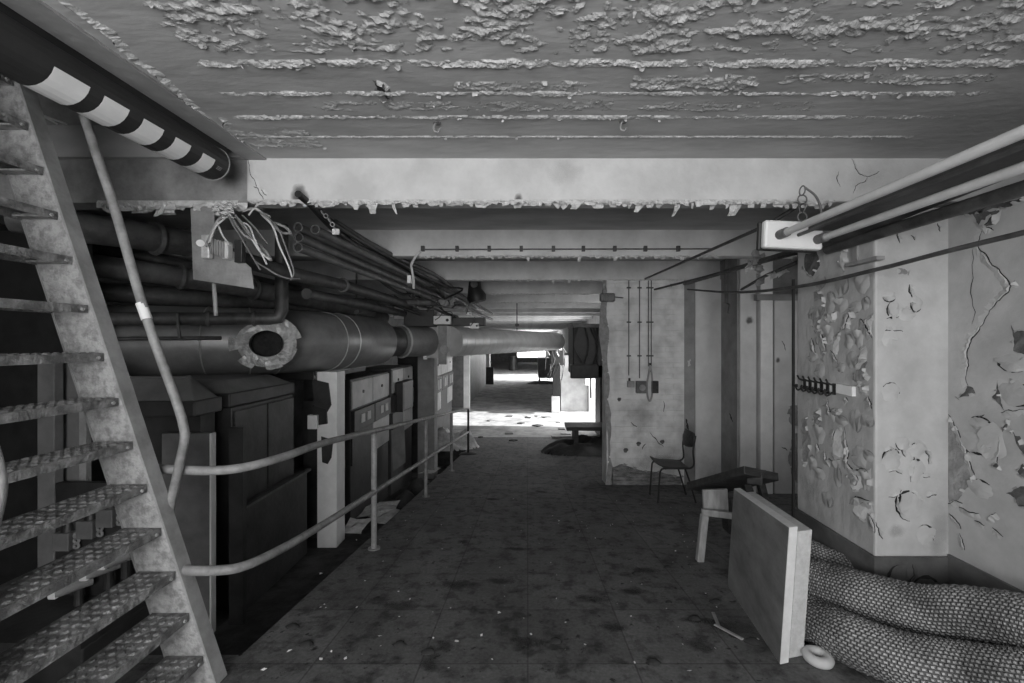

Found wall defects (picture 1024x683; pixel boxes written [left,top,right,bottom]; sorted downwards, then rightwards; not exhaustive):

peeling [142,0,1024,150]
peeling [96,199,835,217]
crack [836,158,880,194]
spalling [599,284,684,485]
peeling [786,405,876,522]
peeling [802,249,874,362]
peeling [853,359,871,395]
peeling [947,417,976,502]
peeling [955,385,975,400]
crack [960,214,1020,388]
peeling [992,384,1024,510]
peeling [1011,326,1024,373]